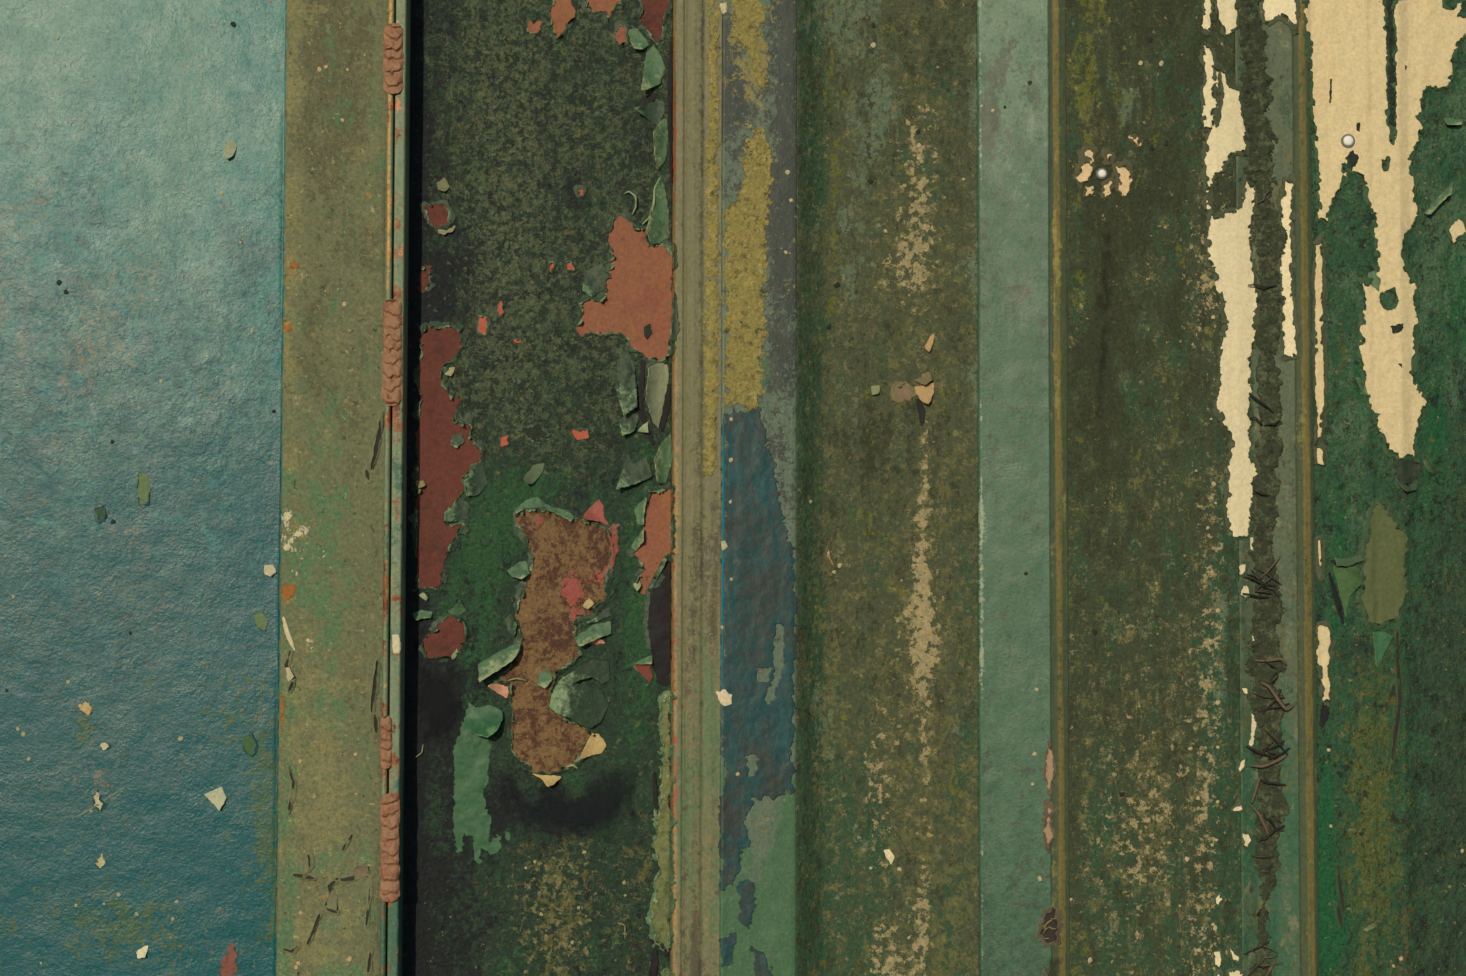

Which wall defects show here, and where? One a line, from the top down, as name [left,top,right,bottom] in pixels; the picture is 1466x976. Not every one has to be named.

peeling [418,265,434,293]
peeling [419,178,456,235]
peeling [392,301,552,663]
peeling [464,0,680,976]
peeling [1073,134,1144,200]
peeling [1198,0,1261,601]
peeling [1261,0,1466,707]
peeling [716,689,732,706]